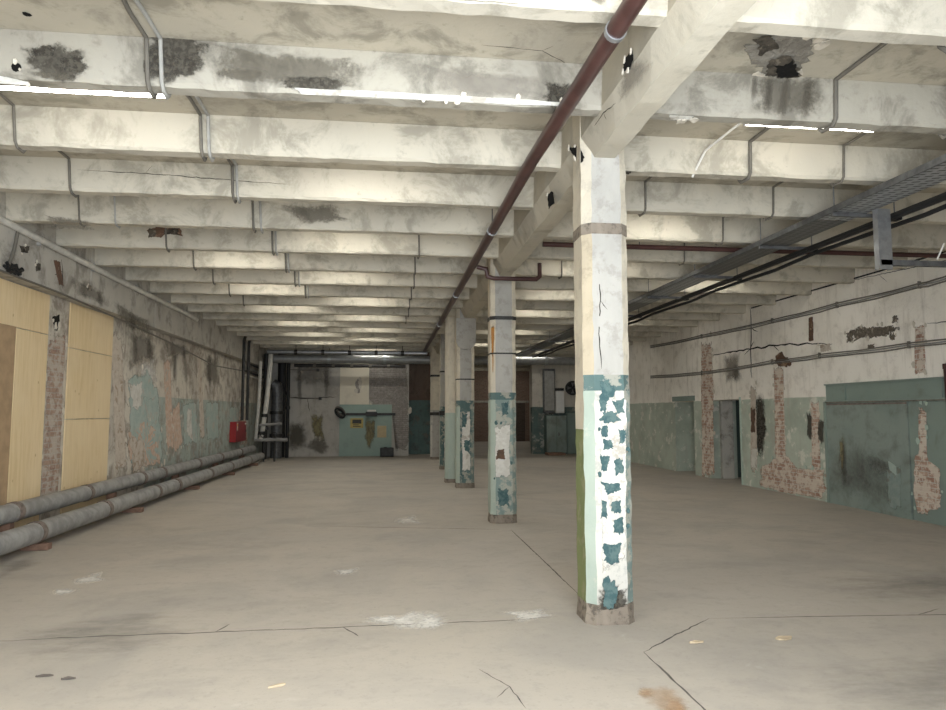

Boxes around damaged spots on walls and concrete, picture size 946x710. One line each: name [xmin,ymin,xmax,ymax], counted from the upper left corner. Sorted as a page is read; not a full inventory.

water stain [27,44,86,81]
mould [144,37,208,83]
water stain [758,78,820,112]
peeling [123,354,205,474]
peeling [461,411,472,477]
peeling [494,402,513,508]
peeling [598,381,630,610]
flaking render [700,331,715,477]
flaking render [749,352,827,502]
flaking render [911,401,943,515]